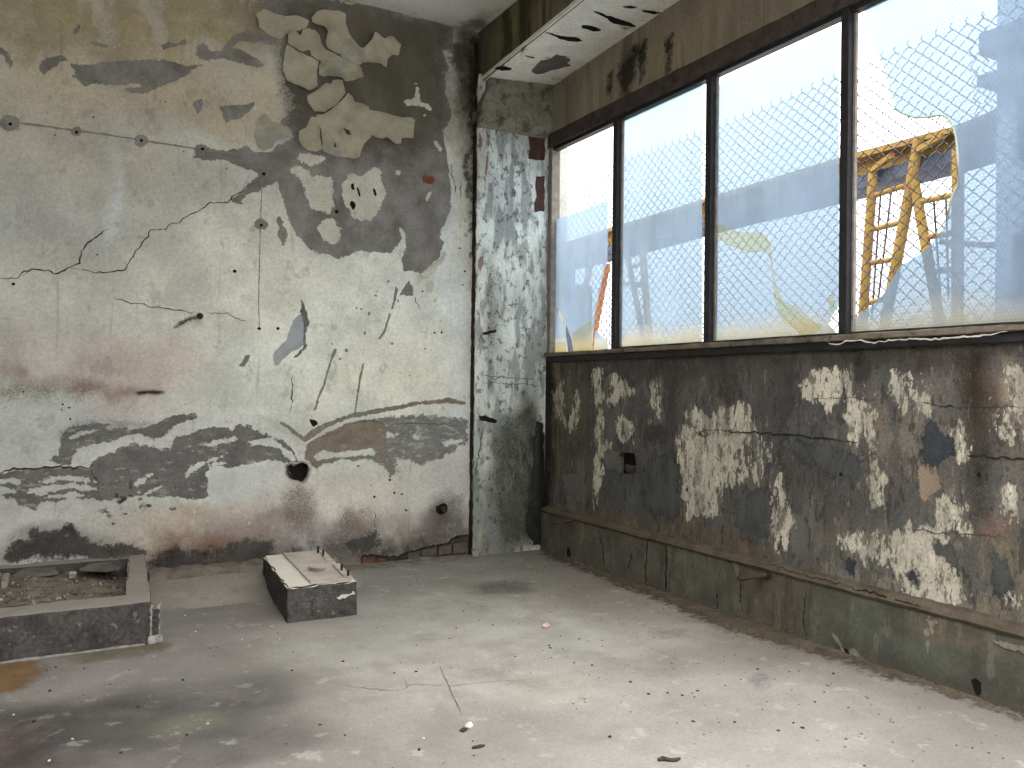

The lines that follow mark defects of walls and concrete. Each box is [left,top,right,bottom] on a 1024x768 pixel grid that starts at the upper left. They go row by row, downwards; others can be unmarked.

peeling [525,54,571,74]
damp [606,33,649,105]
damp [664,32,674,74]
flaking render [39,0,458,303]
crack [0,183,256,279]
crack [114,298,247,322]
peeling [273,300,309,366]
spalling [285,461,312,484]
damp [485,359,557,552]
crack [703,397,880,484]
flaking render [932,537,968,584]
crack [339,667,491,712]